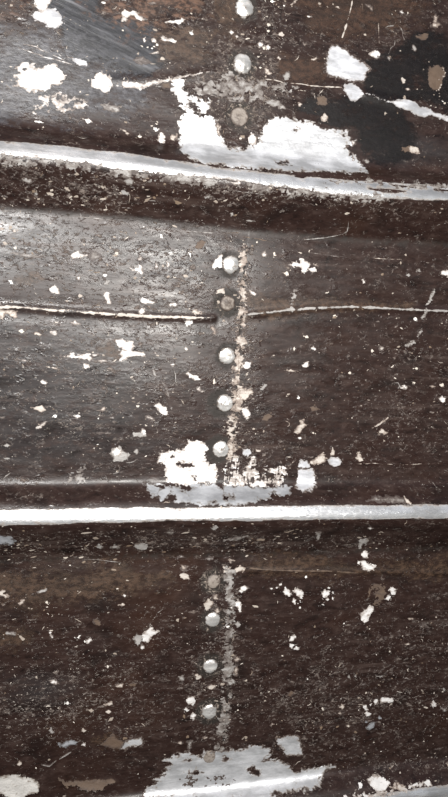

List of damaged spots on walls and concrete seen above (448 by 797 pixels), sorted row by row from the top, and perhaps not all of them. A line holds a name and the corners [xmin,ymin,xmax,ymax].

peeling [13,62,92,124]
peeling [91,70,121,113]
peeling [157,66,448,204]
peeling [0,153,217,199]
peeling [146,439,342,508]
peeling [100,733,145,752]
peeling [58,777,115,793]
peeling [141,735,337,797]
peeling [343,773,433,797]